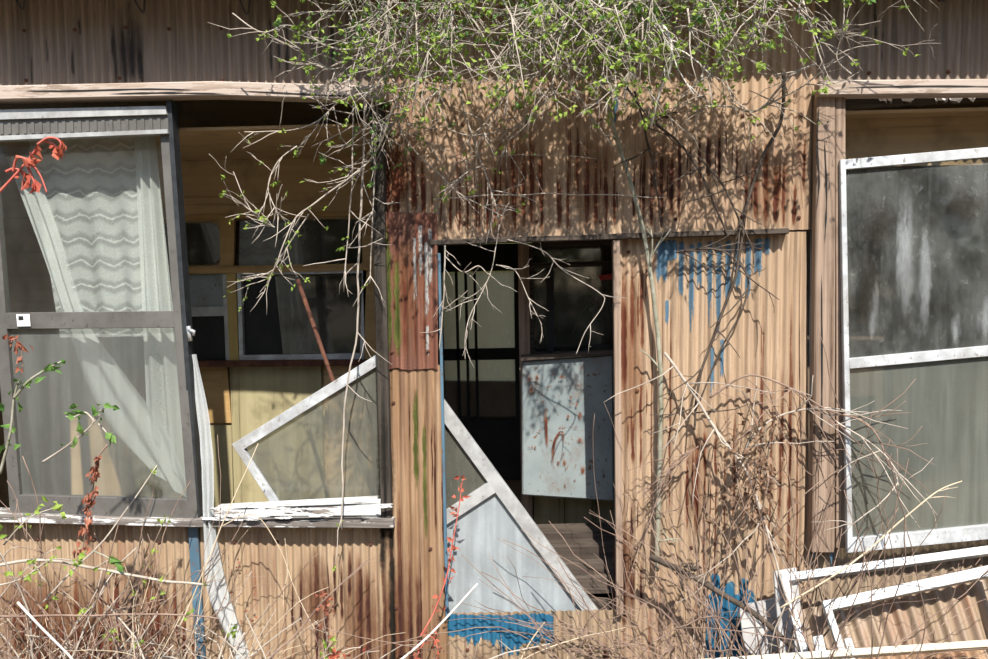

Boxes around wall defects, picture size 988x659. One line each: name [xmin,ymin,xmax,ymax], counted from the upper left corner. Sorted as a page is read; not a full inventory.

corrosion [386,138,543,232]
corrosion [632,131,813,226]
peeling [413,226,432,314]
peeling [656,238,770,395]
corrosion [621,263,672,506]
corrosion [760,327,799,570]
peeling [203,506,336,521]
corrosion [291,510,422,659]
peeling [447,613,554,656]
corrosion [613,506,643,609]
corrosion [686,418,736,584]
peeling [705,573,755,658]